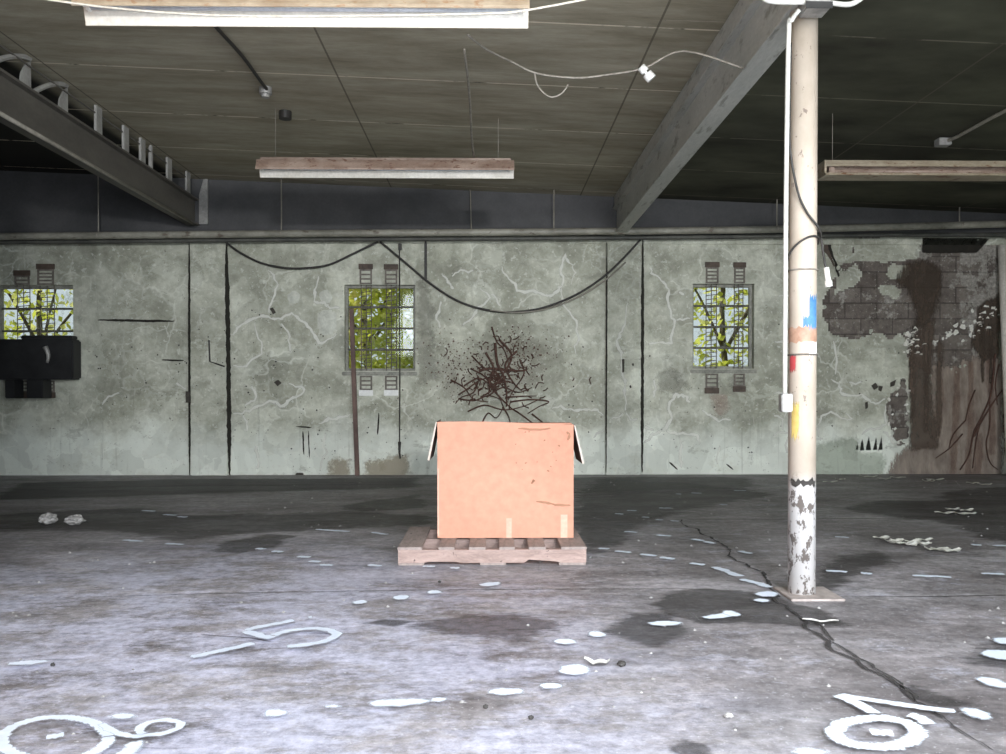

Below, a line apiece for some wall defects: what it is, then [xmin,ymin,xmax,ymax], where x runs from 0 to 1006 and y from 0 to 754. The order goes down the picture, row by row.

crack [225,244,351,475]
crack [435,253,580,354]
crack [552,240,733,472]
crack [824,245,840,277]
crack [816,341,894,444]
peeling [871,378,911,446]
peeling [822,237,1000,377]
leakage [896,259,944,451]
leakage [971,296,1001,383]
crack [449,585,505,593]
leakage [604,614,685,645]
crack [681,520,993,750]